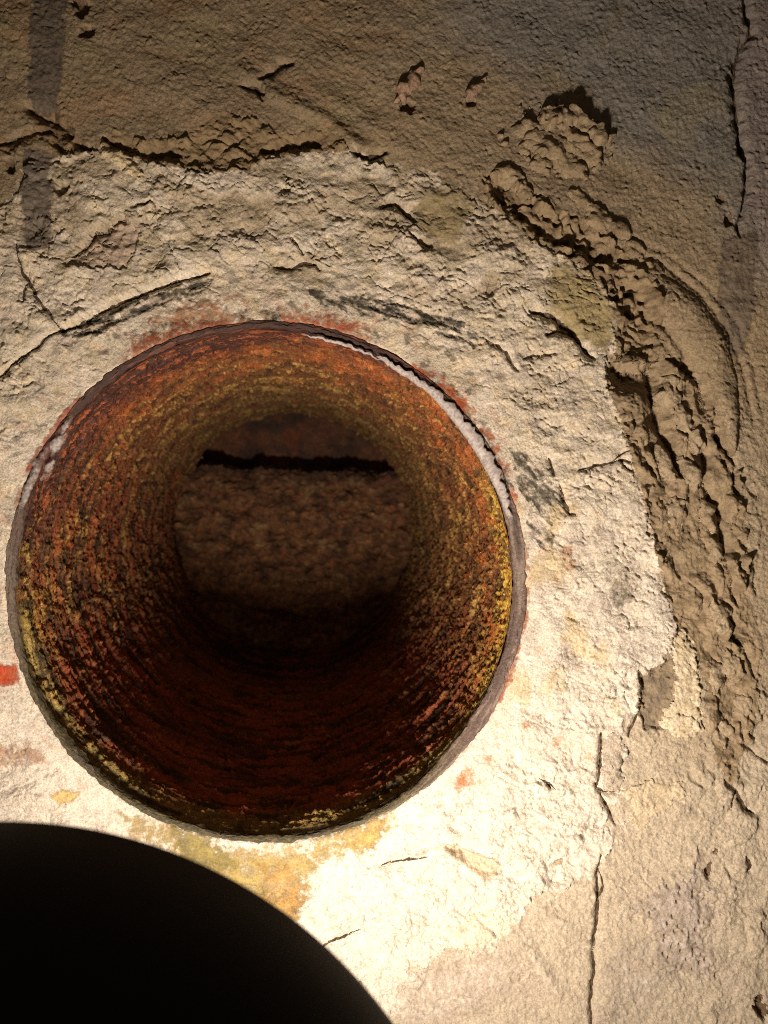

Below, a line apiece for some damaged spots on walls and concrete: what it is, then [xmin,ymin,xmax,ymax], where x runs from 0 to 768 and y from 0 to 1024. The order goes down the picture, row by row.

spalling [0,111,349,181]
crack [727,0,751,235]
peeling [68,219,141,270]
crack [0,243,210,378]
corrosion [132,302,249,356]
corrosion [279,304,368,340]
spalling [308,290,478,349]
corrosion [413,364,475,416]
corrosion [26,396,82,473]
spalling [482,170,762,791]
crack [595,733,615,819]
crack [589,855,604,1024]